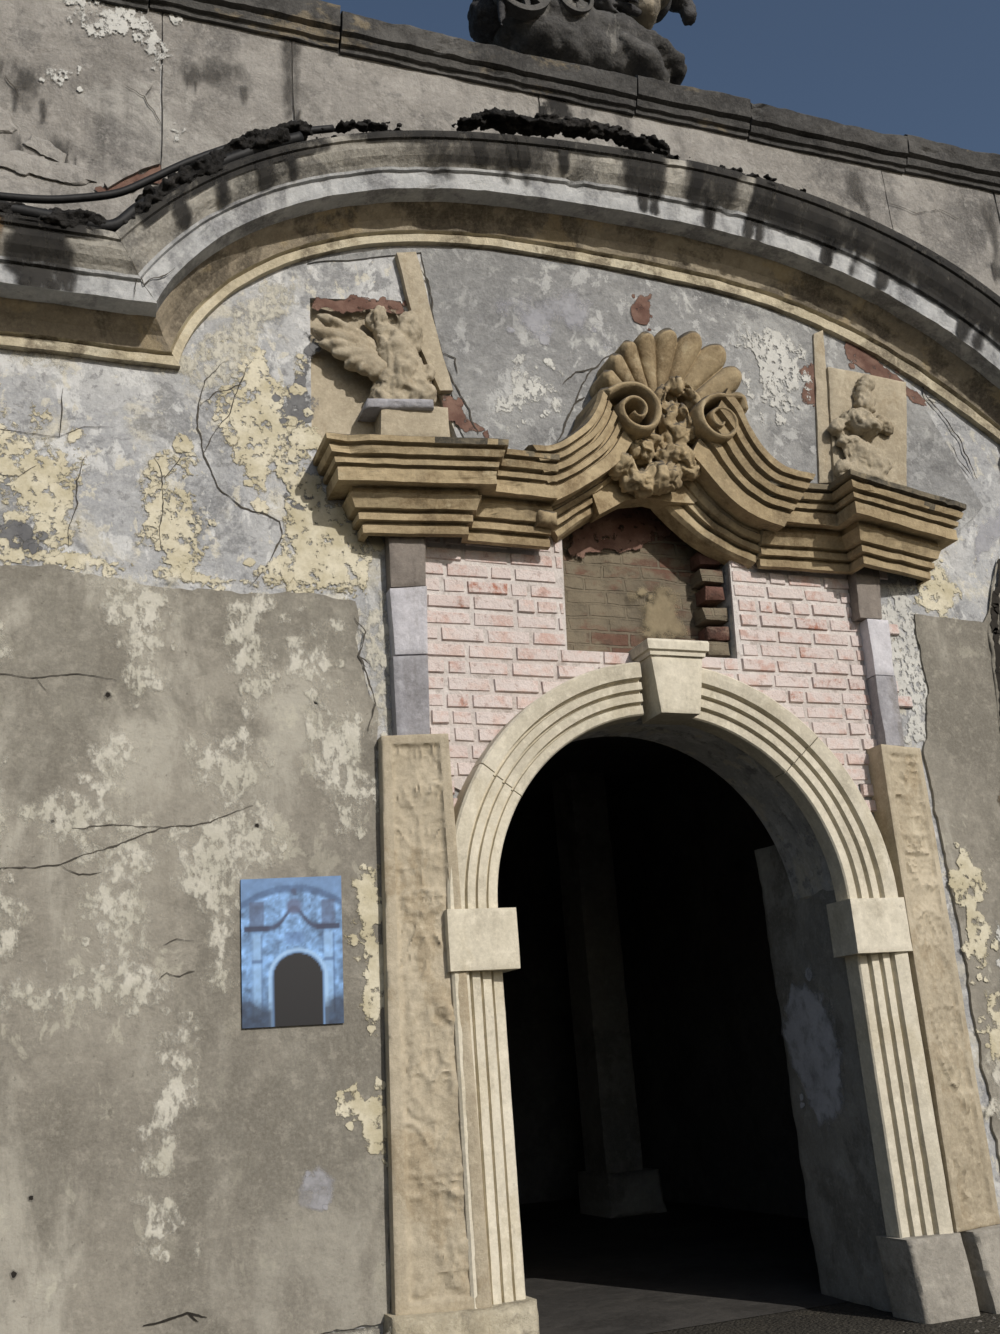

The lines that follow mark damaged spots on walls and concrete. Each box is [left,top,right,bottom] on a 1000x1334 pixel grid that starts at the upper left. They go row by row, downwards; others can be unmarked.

peeling [66,0,174,70]
damp [350,130,667,214]
damp [0,212,100,292]
damp [687,160,1000,349]
spalling [312,294,407,314]
damp [501,293,596,345]
crack [154,361,289,587]
crack [0,673,115,689]
crack [987,556,1000,731]
peeling [0,283,392,1178]
crack [0,805,253,875]
peeling [948,842,1000,1119]